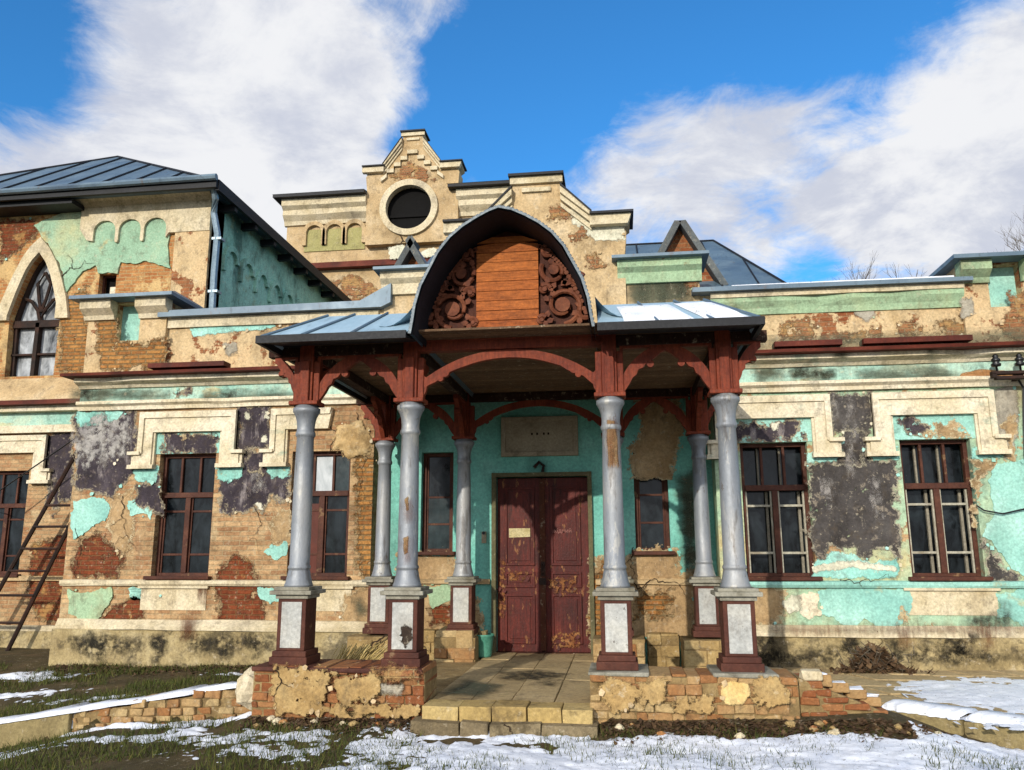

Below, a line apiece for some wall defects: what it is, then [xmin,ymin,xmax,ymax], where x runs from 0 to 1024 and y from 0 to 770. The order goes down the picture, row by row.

flaking render [545,205,626,272]
spalling [55,284,170,373]
peeling [25,410,165,625]
peeling [215,406,293,560]
peeling [736,390,913,626]
peeling [897,386,1024,626]
mould [70,636,167,663]
damp [191,637,269,658]
spalling [214,553,279,620]
flaking render [625,543,695,643]
damp [757,637,859,666]
damp [881,602,1009,664]